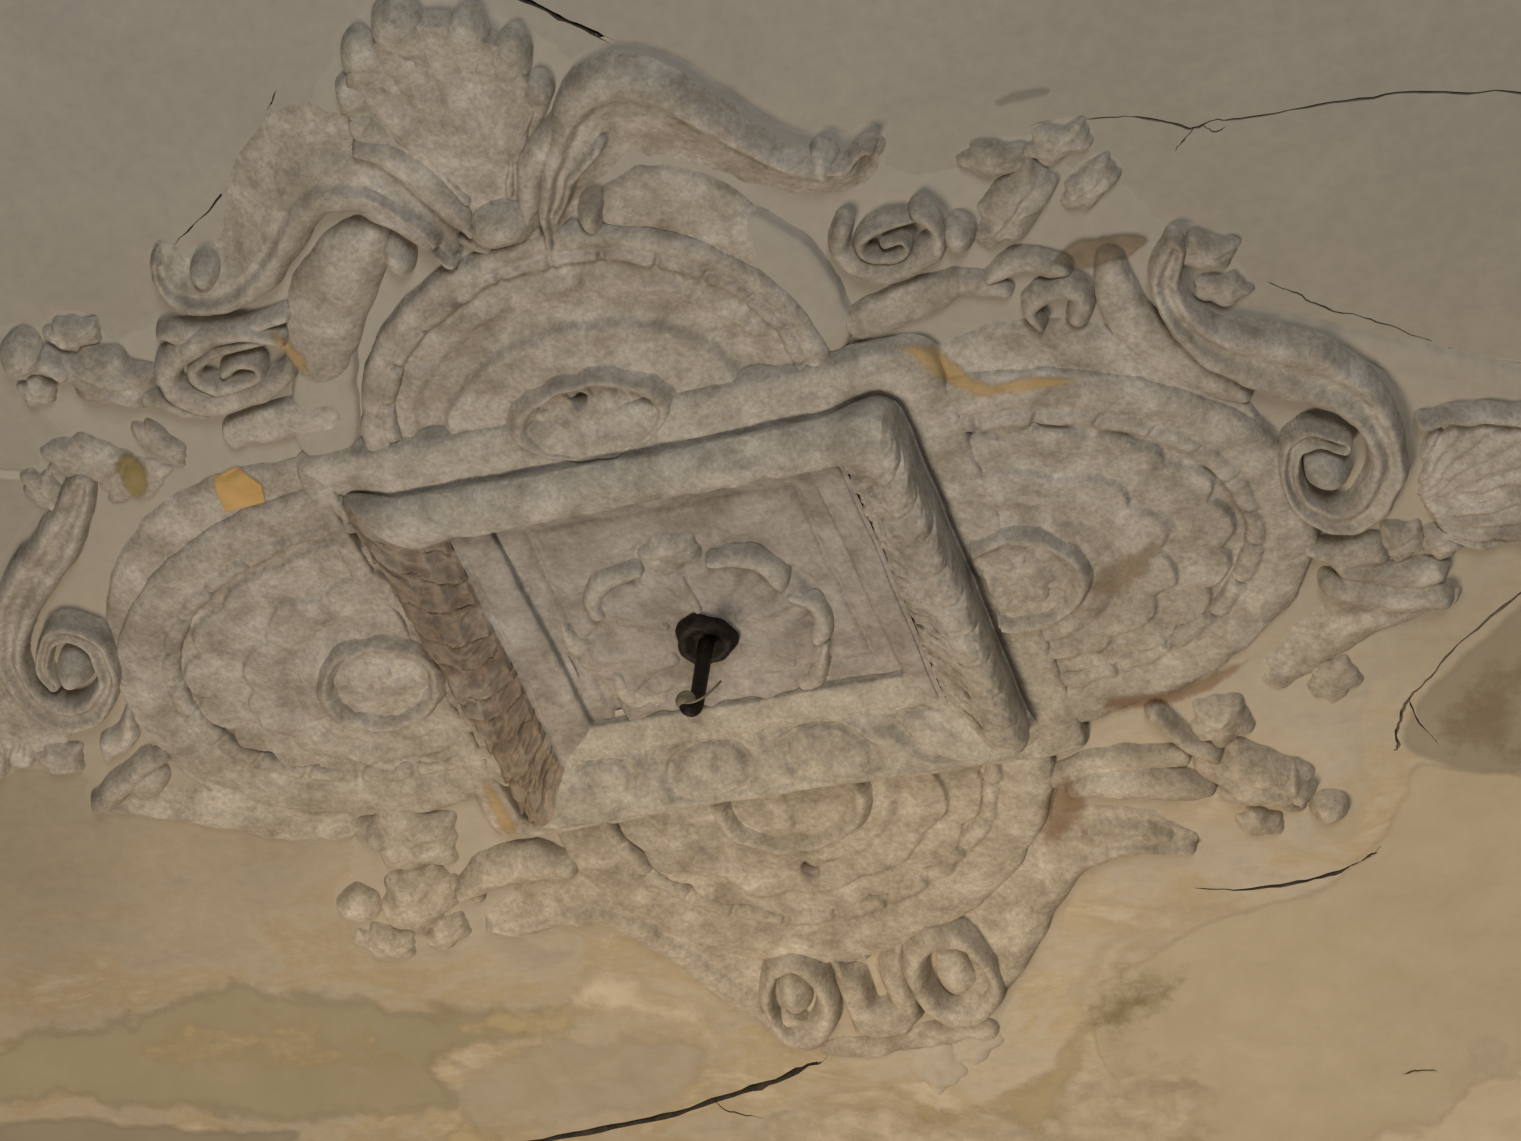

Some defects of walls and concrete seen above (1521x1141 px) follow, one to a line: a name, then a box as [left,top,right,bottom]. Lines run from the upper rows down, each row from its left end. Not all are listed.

crack [518,0,609,43]
crack [1031,90,1521,151]
crack [1394,592,1521,751]
peeling [764,765,1521,1141]
crack [529,1057,827,1141]